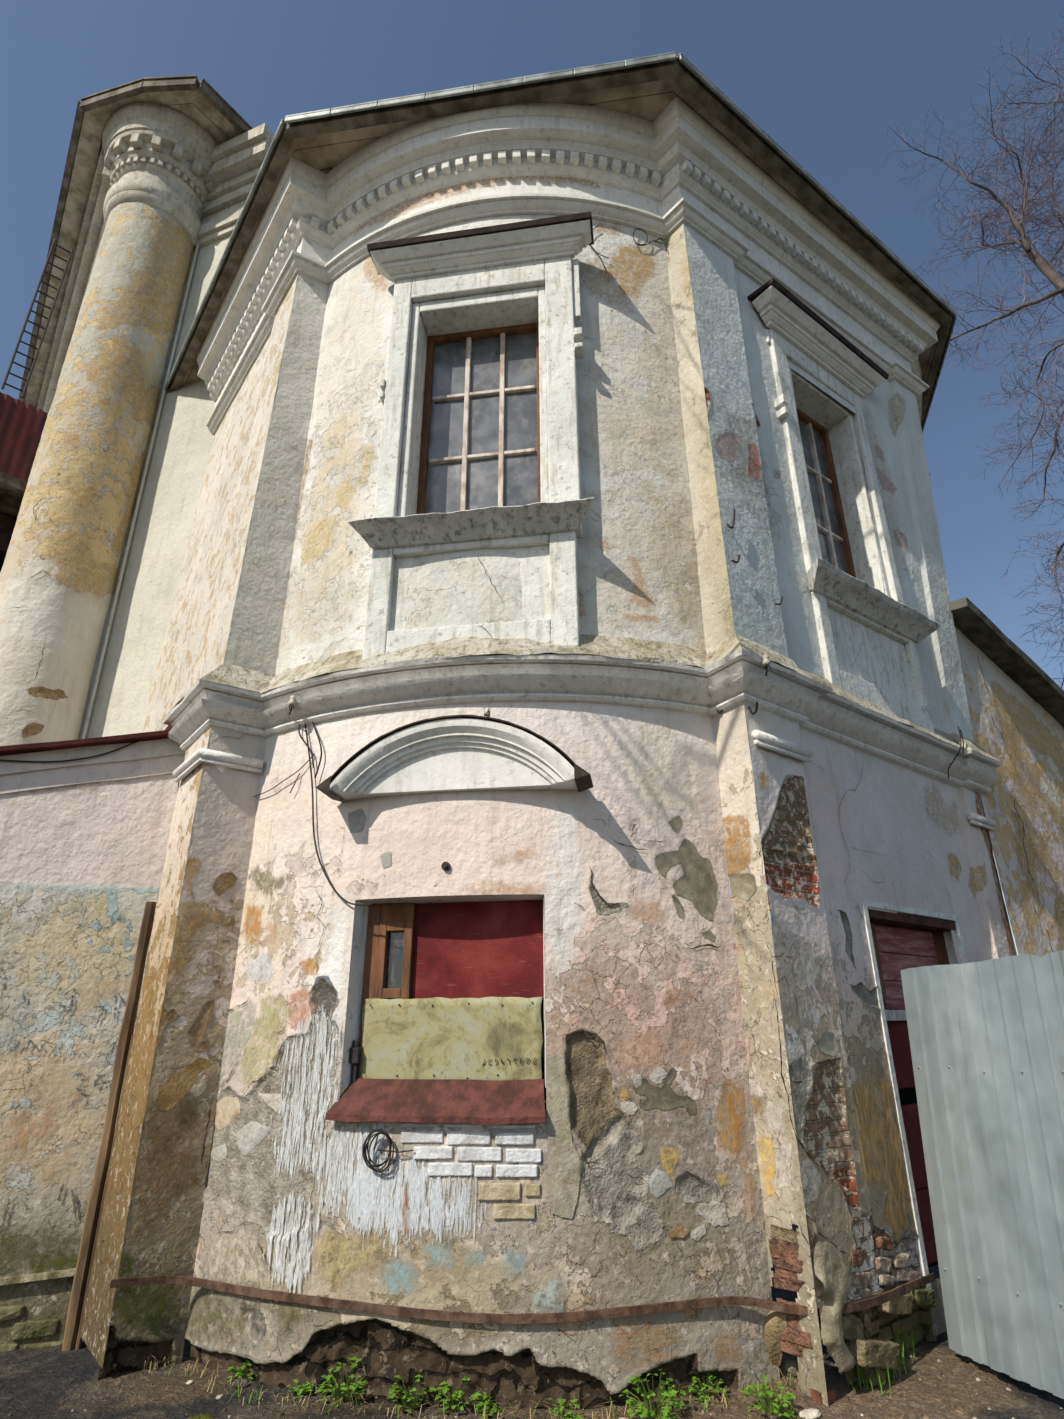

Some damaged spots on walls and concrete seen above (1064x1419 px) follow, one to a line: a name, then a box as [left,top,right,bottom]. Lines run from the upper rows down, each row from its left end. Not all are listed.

peeling [716,432,780,479]
flaking render [655,775,820,1026]
flaking render [203,978,343,1293]
flaking render [565,1031,729,1251]
crack [767,943,840,1179]
crack [799,1217,847,1254]
flaking render [745,1033,920,1303]
crack [871,1208,899,1245]
flaking render [98,1318,739,1411]